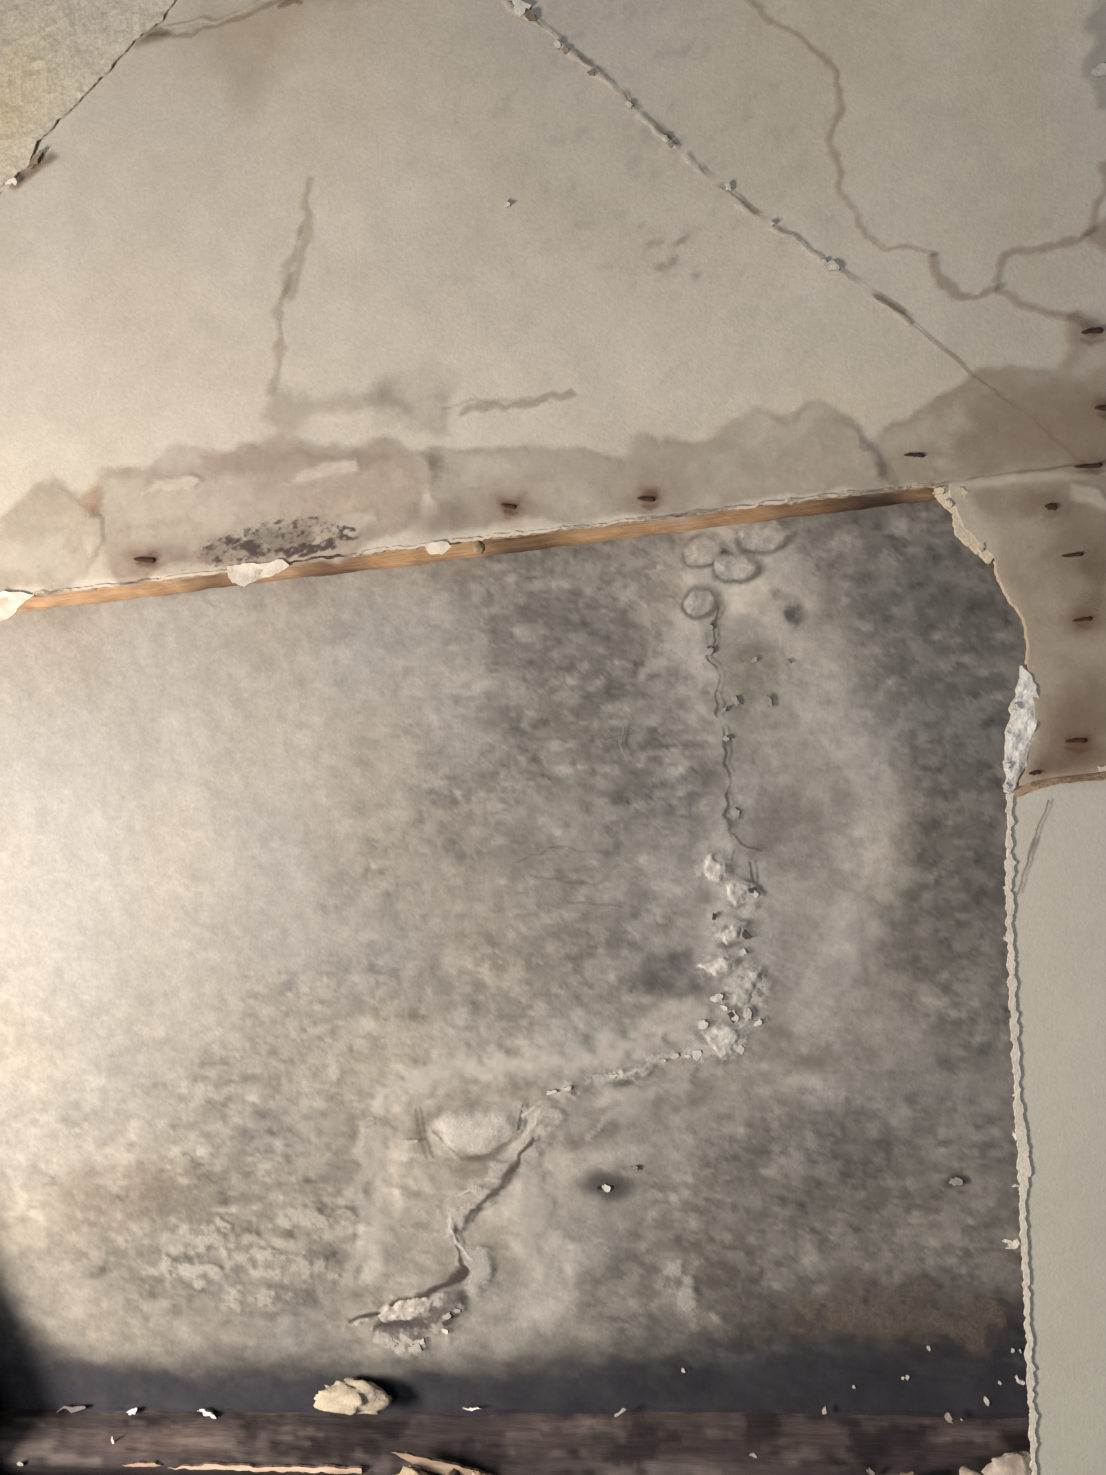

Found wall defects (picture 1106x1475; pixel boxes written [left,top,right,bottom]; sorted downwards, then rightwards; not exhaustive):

crack [502,0,1105,475]
leakage [189,369,1106,567]
spalling [932,485,994,564]
crack [704,607,791,885]
leakage [744,606,799,646]
spalling [1002,666,1039,794]
leakage [1036,674,1106,770]
leakage [160,1007,716,1311]
crack [348,1104,541,1323]
spalling [352,852,770,1358]
spalling [944,1175,964,1187]
leakage [0,1277,1030,1419]